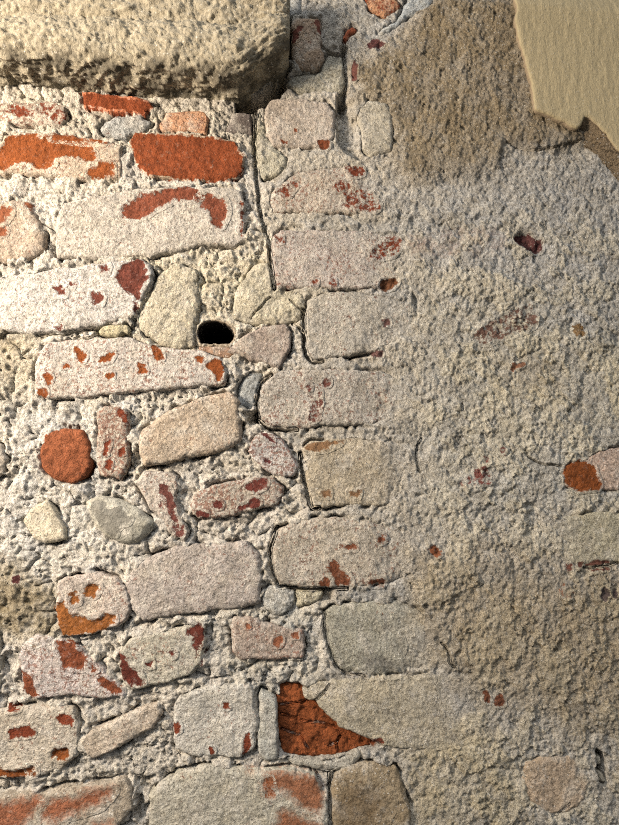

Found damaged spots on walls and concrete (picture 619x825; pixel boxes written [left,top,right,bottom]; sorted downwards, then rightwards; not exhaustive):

peeling [513,0,619,181]